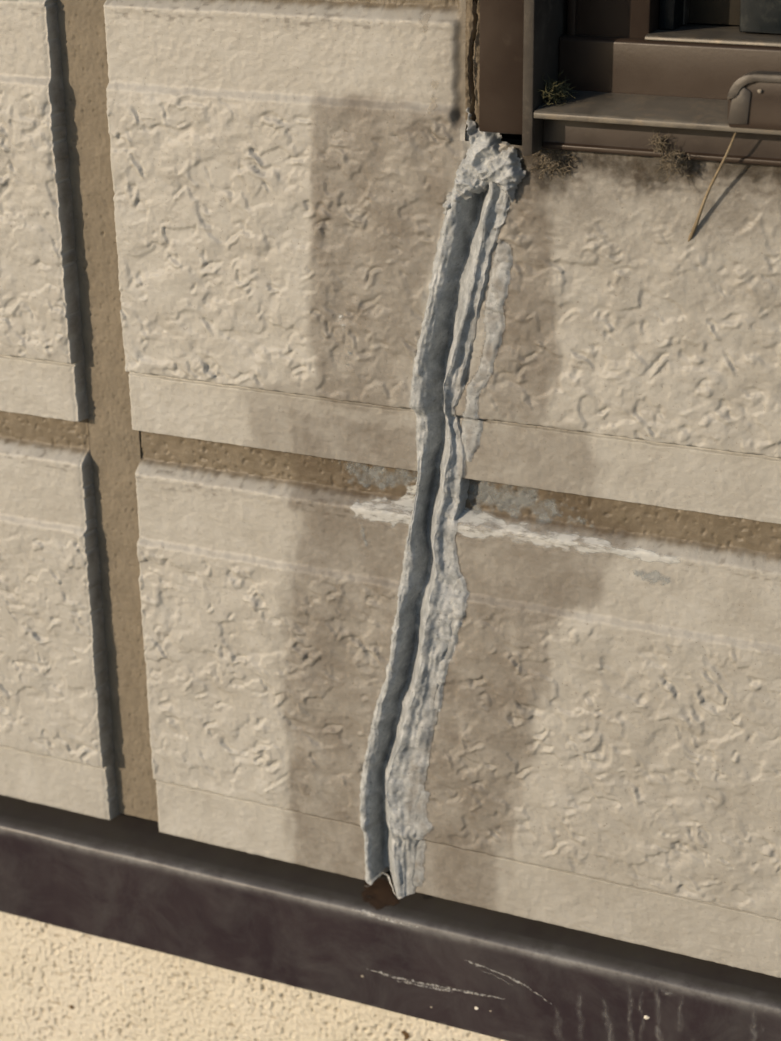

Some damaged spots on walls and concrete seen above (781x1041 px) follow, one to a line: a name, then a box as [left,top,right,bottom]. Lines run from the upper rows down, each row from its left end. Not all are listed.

rust [362,878,399,910]
crack [359,0,526,899]